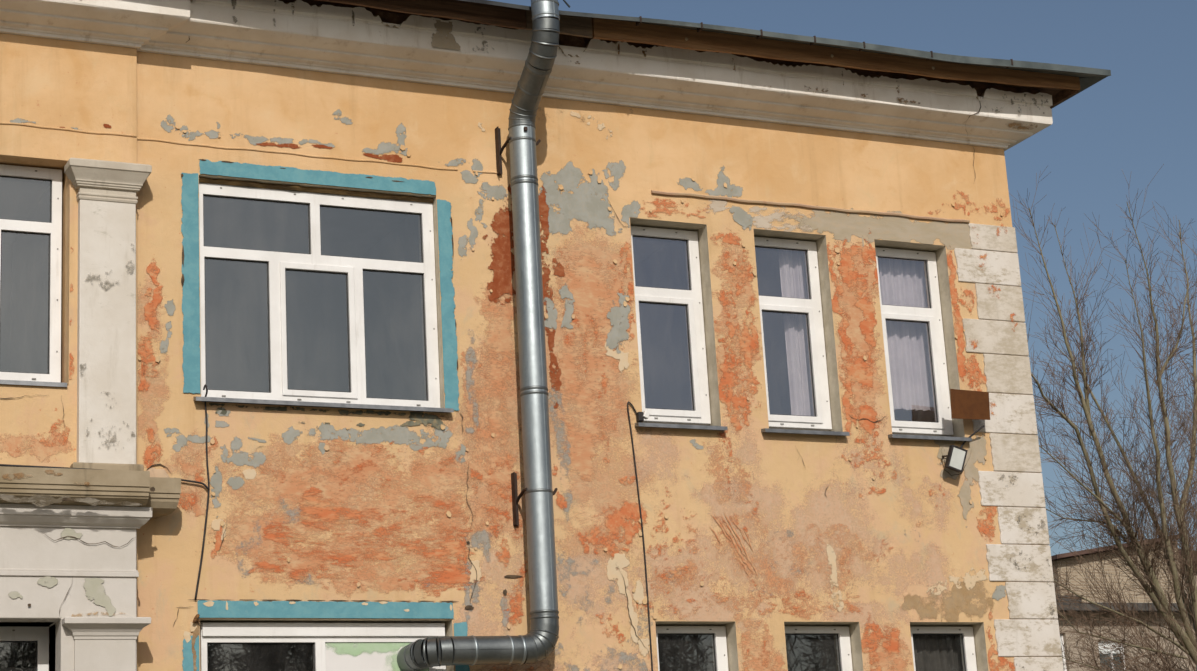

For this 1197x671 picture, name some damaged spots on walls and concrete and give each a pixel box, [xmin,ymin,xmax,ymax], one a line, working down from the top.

spalling [375,11,410,24]
spalling [431,19,460,50]
spalling [559,34,585,48]
peeling [161,114,335,149]
peeling [333,109,353,125]
peeling [83,158,528,636]
peeling [481,160,997,671]
peeling [0,420,71,462]